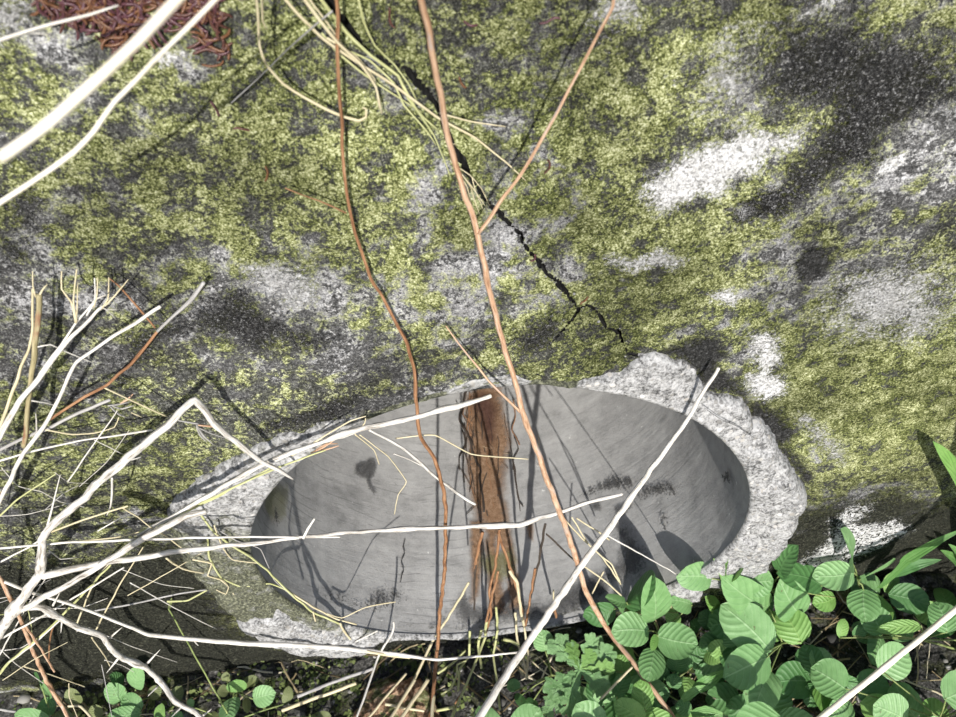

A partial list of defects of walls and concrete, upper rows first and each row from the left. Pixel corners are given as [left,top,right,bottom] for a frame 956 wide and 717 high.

crack [317,0,638,357]
rust [467,388,519,611]